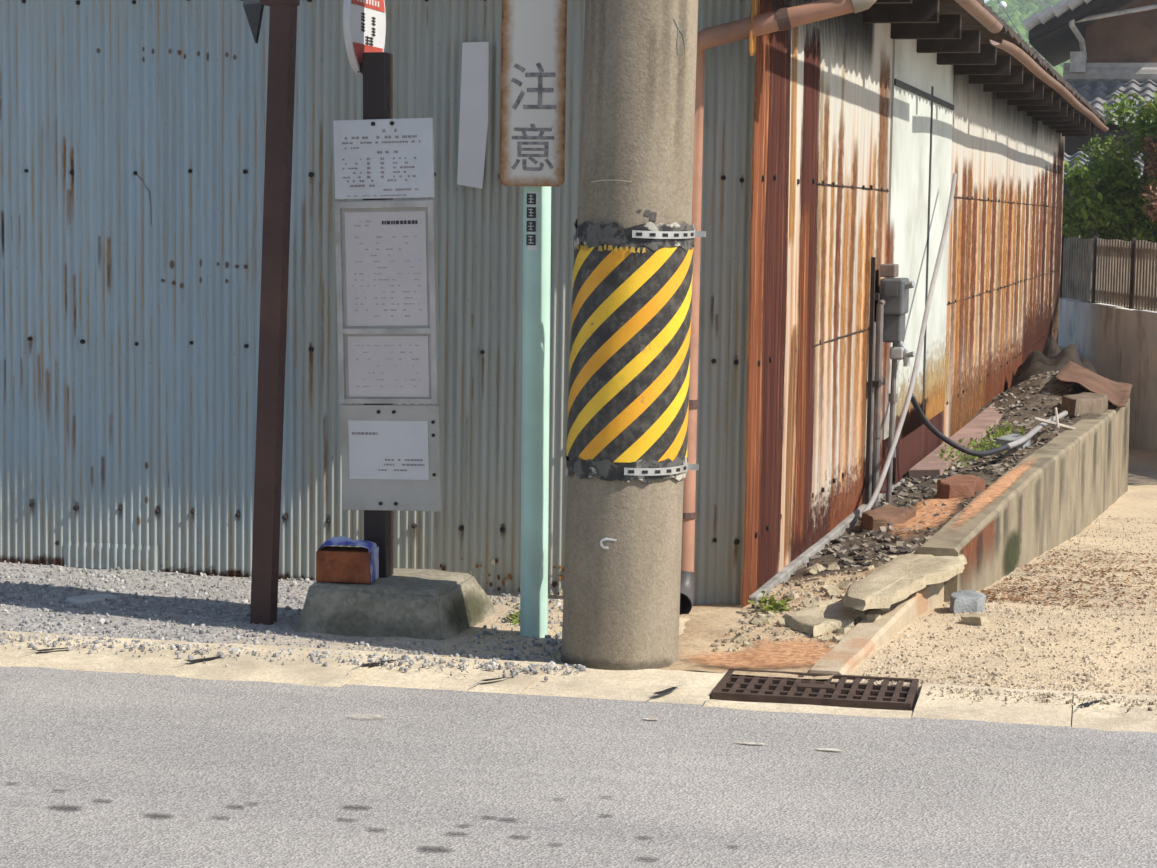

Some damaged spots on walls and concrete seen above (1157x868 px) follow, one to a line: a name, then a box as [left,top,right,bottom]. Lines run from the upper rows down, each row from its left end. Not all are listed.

rust [63,141,74,191]
rust [735,0,1064,608]
rust [0,541,100,570]
rust [157,568,252,577]